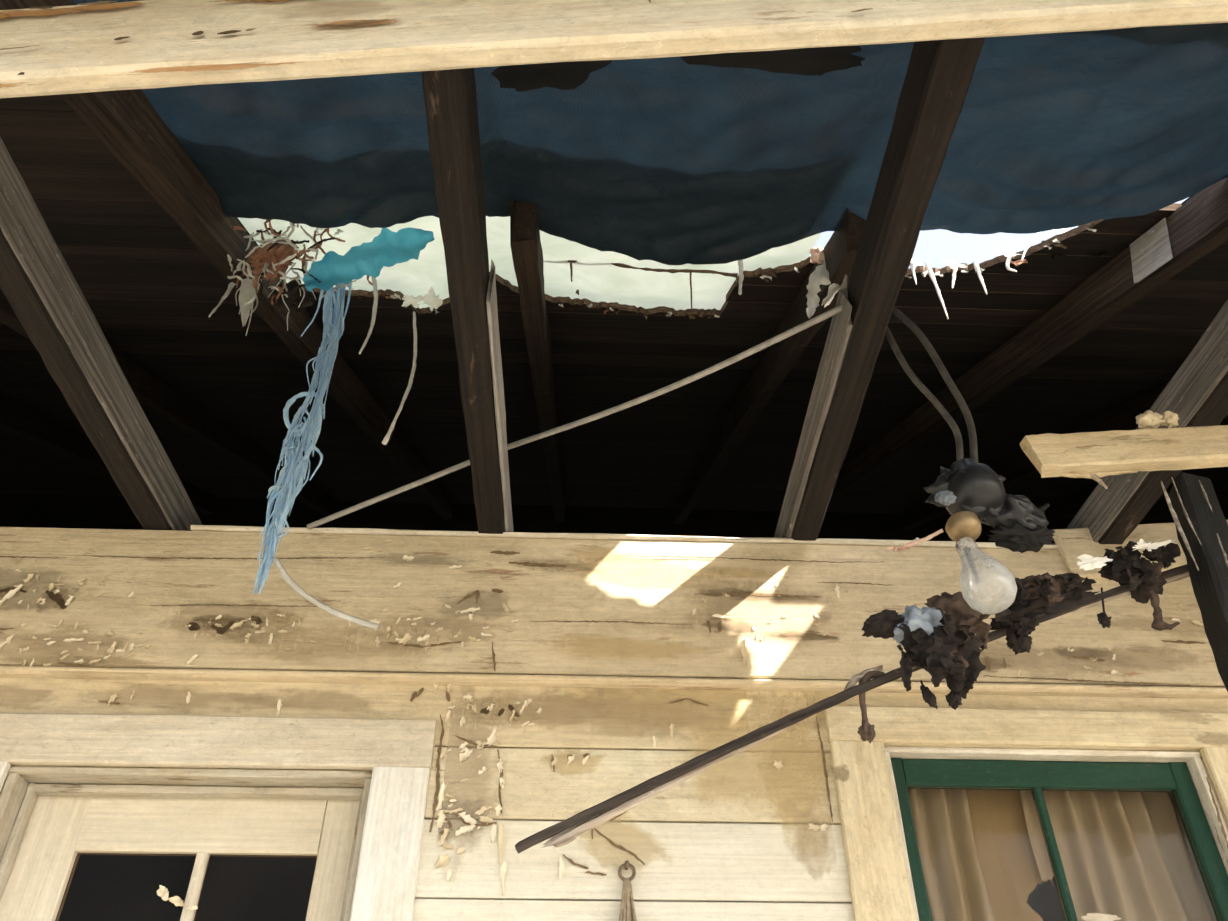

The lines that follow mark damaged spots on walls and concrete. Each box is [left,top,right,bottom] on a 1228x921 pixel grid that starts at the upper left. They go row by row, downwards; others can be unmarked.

peeling [0,558,152,667]
peeling [208,614,295,644]
peeling [370,589,519,671]
peeling [98,690,135,706]
peeling [410,684,543,882]